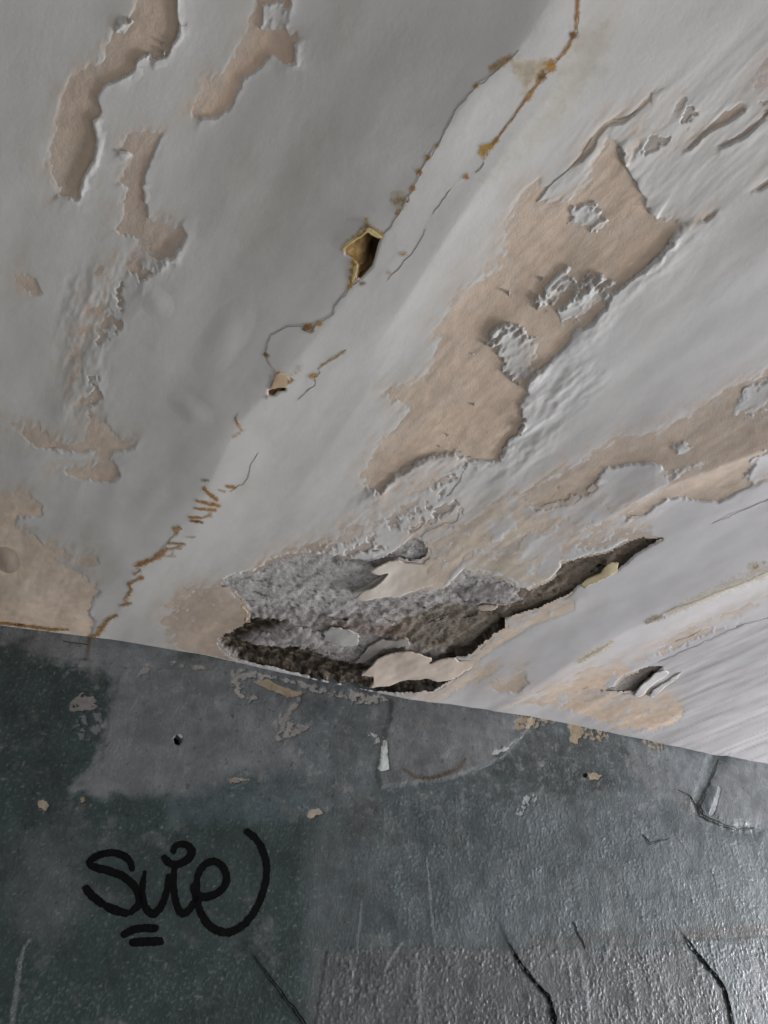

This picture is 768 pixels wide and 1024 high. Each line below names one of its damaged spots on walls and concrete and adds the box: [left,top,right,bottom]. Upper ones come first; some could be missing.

peeling [49,0,190,198]
peeling [192,0,306,120]
corrosion [479,0,580,159]
peeling [5,130,186,482]
crack [266,270,364,369]
peeling [160,89,768,753]
peeling [0,483,99,636]
corrosion [87,480,237,653]
crack [679,759,752,831]
crack [508,943,557,1024]
crack [686,938,734,1024]